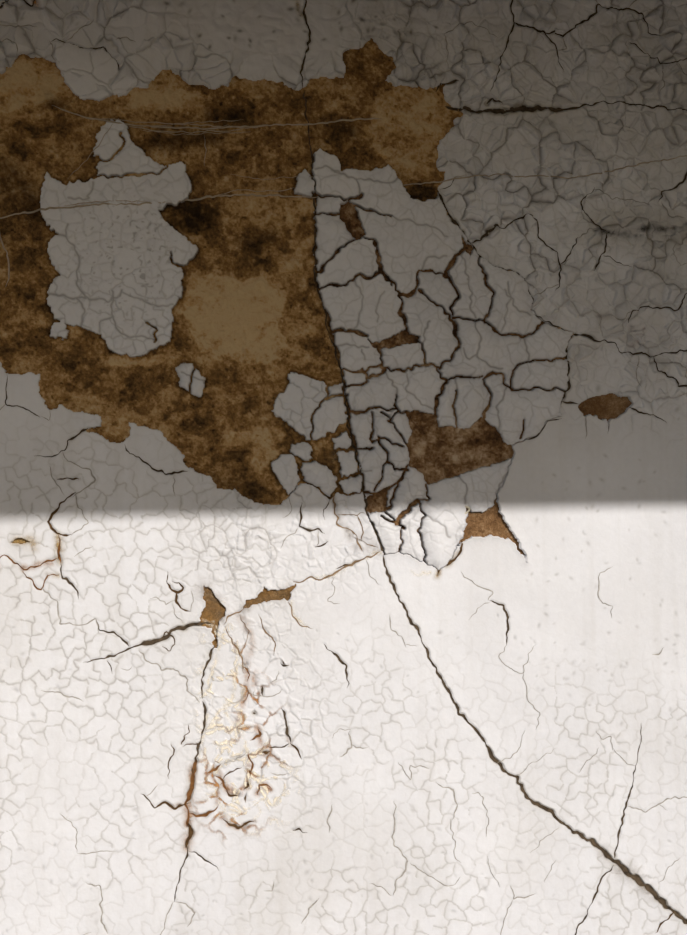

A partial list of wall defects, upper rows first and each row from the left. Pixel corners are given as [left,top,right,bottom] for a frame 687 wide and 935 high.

peeling [0,38,574,570]
peeling [578,393,632,421]
crack [281,0,687,935]
peeling [200,586,226,648]
peeling [243,584,296,609]
crack [0,428,243,935]
crack [268,708,301,758]